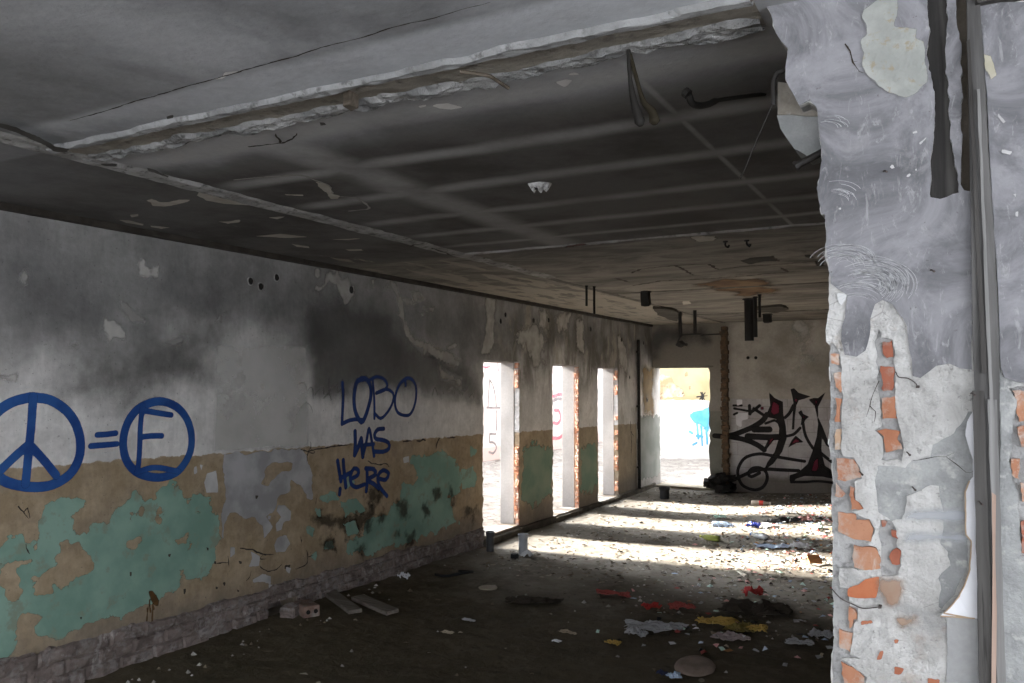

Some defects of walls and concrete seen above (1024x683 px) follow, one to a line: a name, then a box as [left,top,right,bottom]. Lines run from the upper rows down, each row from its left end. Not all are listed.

crack [70,2,490,121]
flaking render [46,0,765,167]
peeling [861,0,928,97]
peeling [147,193,246,207]
flaking render [138,259,160,277]
flaking render [104,319,126,341]
peeling [0,464,272,658]
flaking render [274,505,291,553]
peeling [306,446,477,561]
flaking render [829,330,979,683]